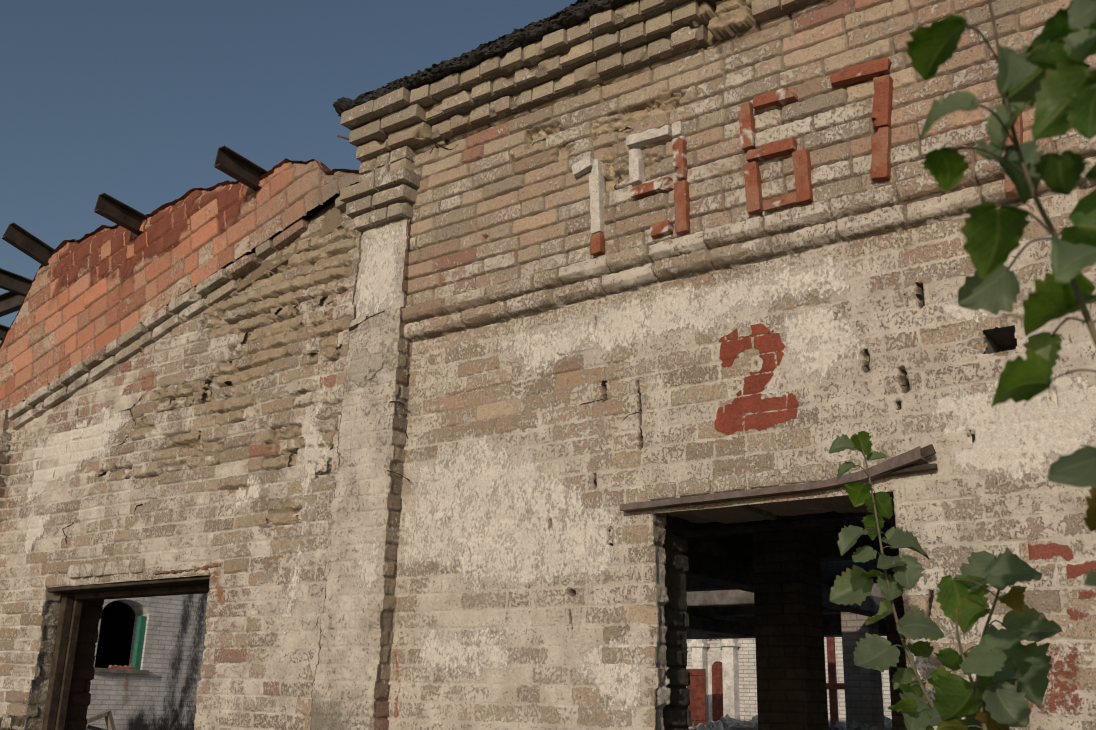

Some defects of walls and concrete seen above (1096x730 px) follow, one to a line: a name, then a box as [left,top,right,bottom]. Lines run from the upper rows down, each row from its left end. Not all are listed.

spalling [144,218,404,426]
crack [580,381,643,445]
spalling [167,430,227,466]
peeling [234,384,337,634]
peeling [349,520,384,594]
peeling [1023,542,1096,579]
peeling [1067,590,1096,620]
peeling [1028,647,1083,714]